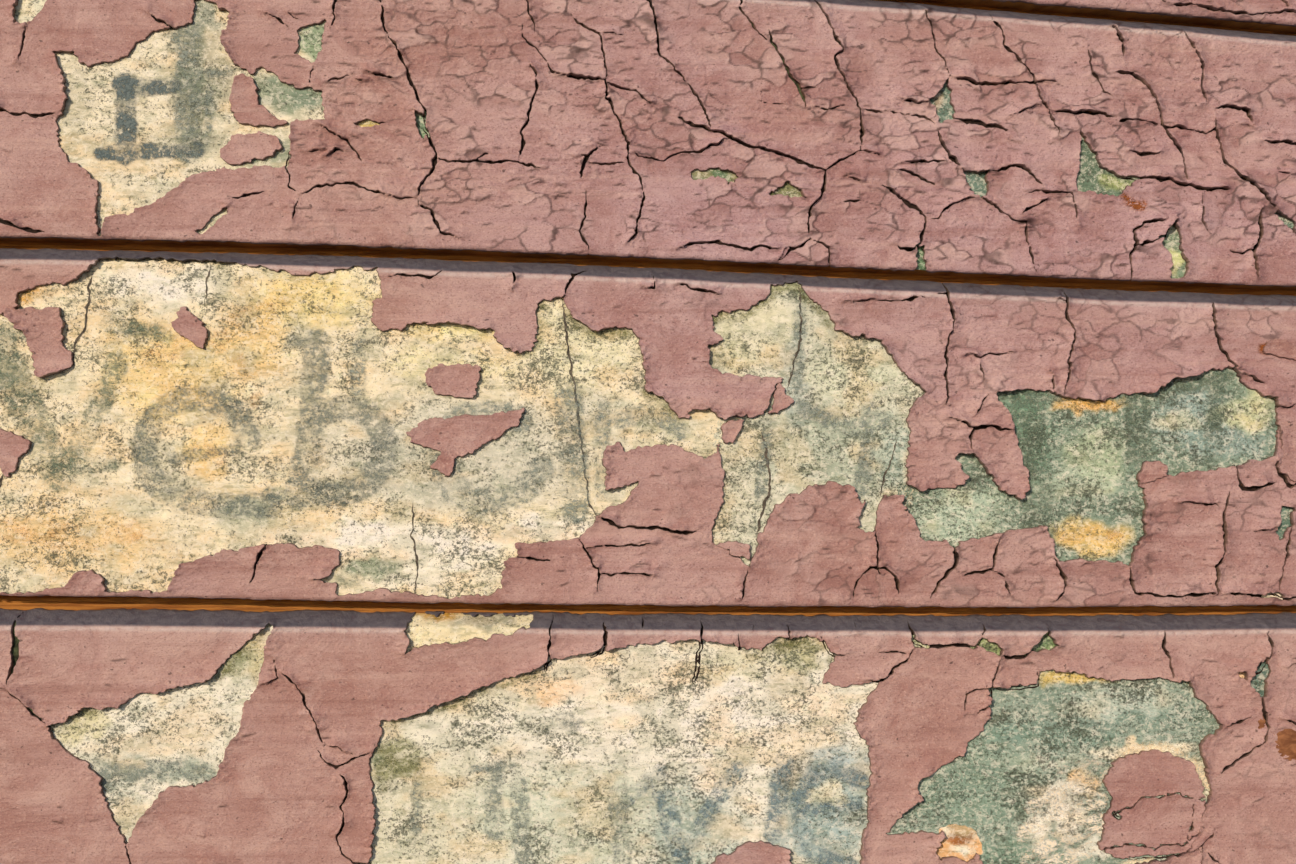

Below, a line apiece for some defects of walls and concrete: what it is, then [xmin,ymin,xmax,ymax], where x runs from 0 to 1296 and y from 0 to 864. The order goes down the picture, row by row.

peeling [55,0,326,236]
crack [1121,106,1263,254]
crack [285,0,1127,658]
peeling [0,258,1277,656]
crack [1129,464,1296,600]
peeling [1276,507,1293,539]
crack [10,615,21,676]
peeling [50,623,273,842]
crack [268,660,371,864]
peeling [368,634,879,864]
crack [692,624,703,683]
peeling [886,670,1220,864]